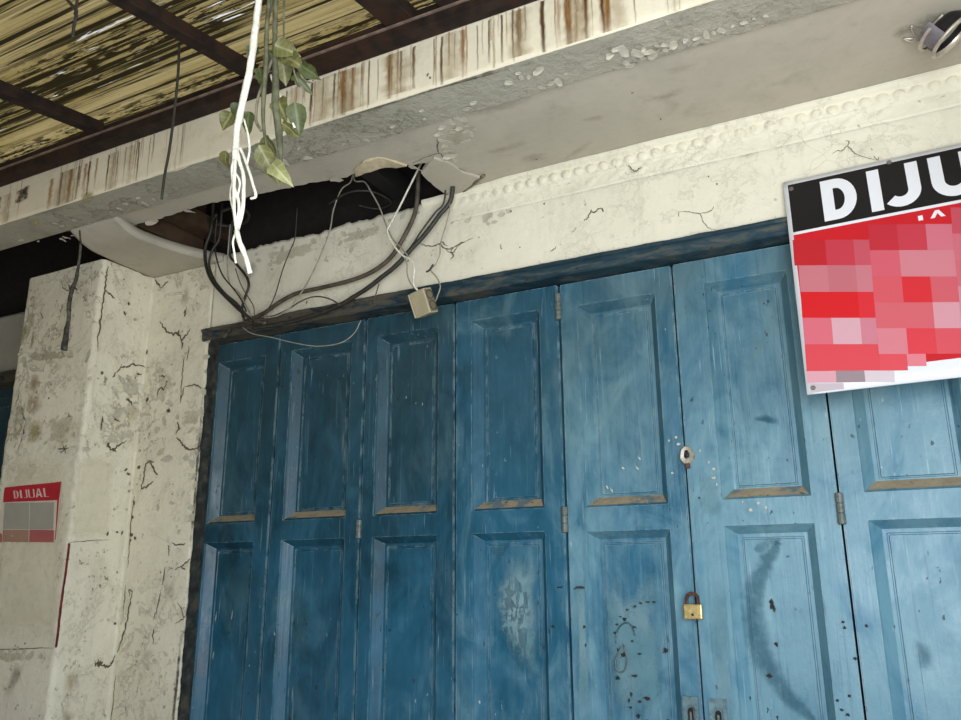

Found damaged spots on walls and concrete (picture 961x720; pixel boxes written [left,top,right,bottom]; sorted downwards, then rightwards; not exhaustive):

rust [461,9,521,53]
rust [540,0,571,38]
rust [601,0,609,23]
flaking render [606,14,769,68]
rust [333,61,370,101]
rust [387,46,415,83]
flaking render [504,66,568,90]
flaking render [434,101,478,163]
crack [422,239,470,258]
crack [97,260,168,351]
crack [100,309,209,452]
crack [77,460,158,716]